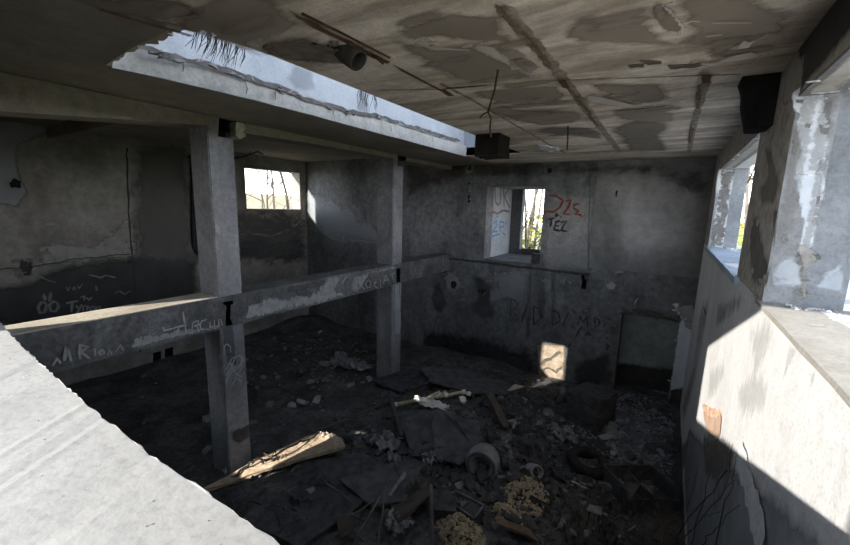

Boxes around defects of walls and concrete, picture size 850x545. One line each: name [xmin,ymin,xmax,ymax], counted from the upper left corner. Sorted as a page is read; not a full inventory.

water stain [80,0,313,51]
spalling [263,40,343,64]
water stain [397,12,601,138]
water stain [594,84,681,151]
water stain [568,0,788,58]
corrosion [696,75,711,109]
peeling [783,51,850,299]
peeling [704,136,788,285]
peeling [245,267,396,319]